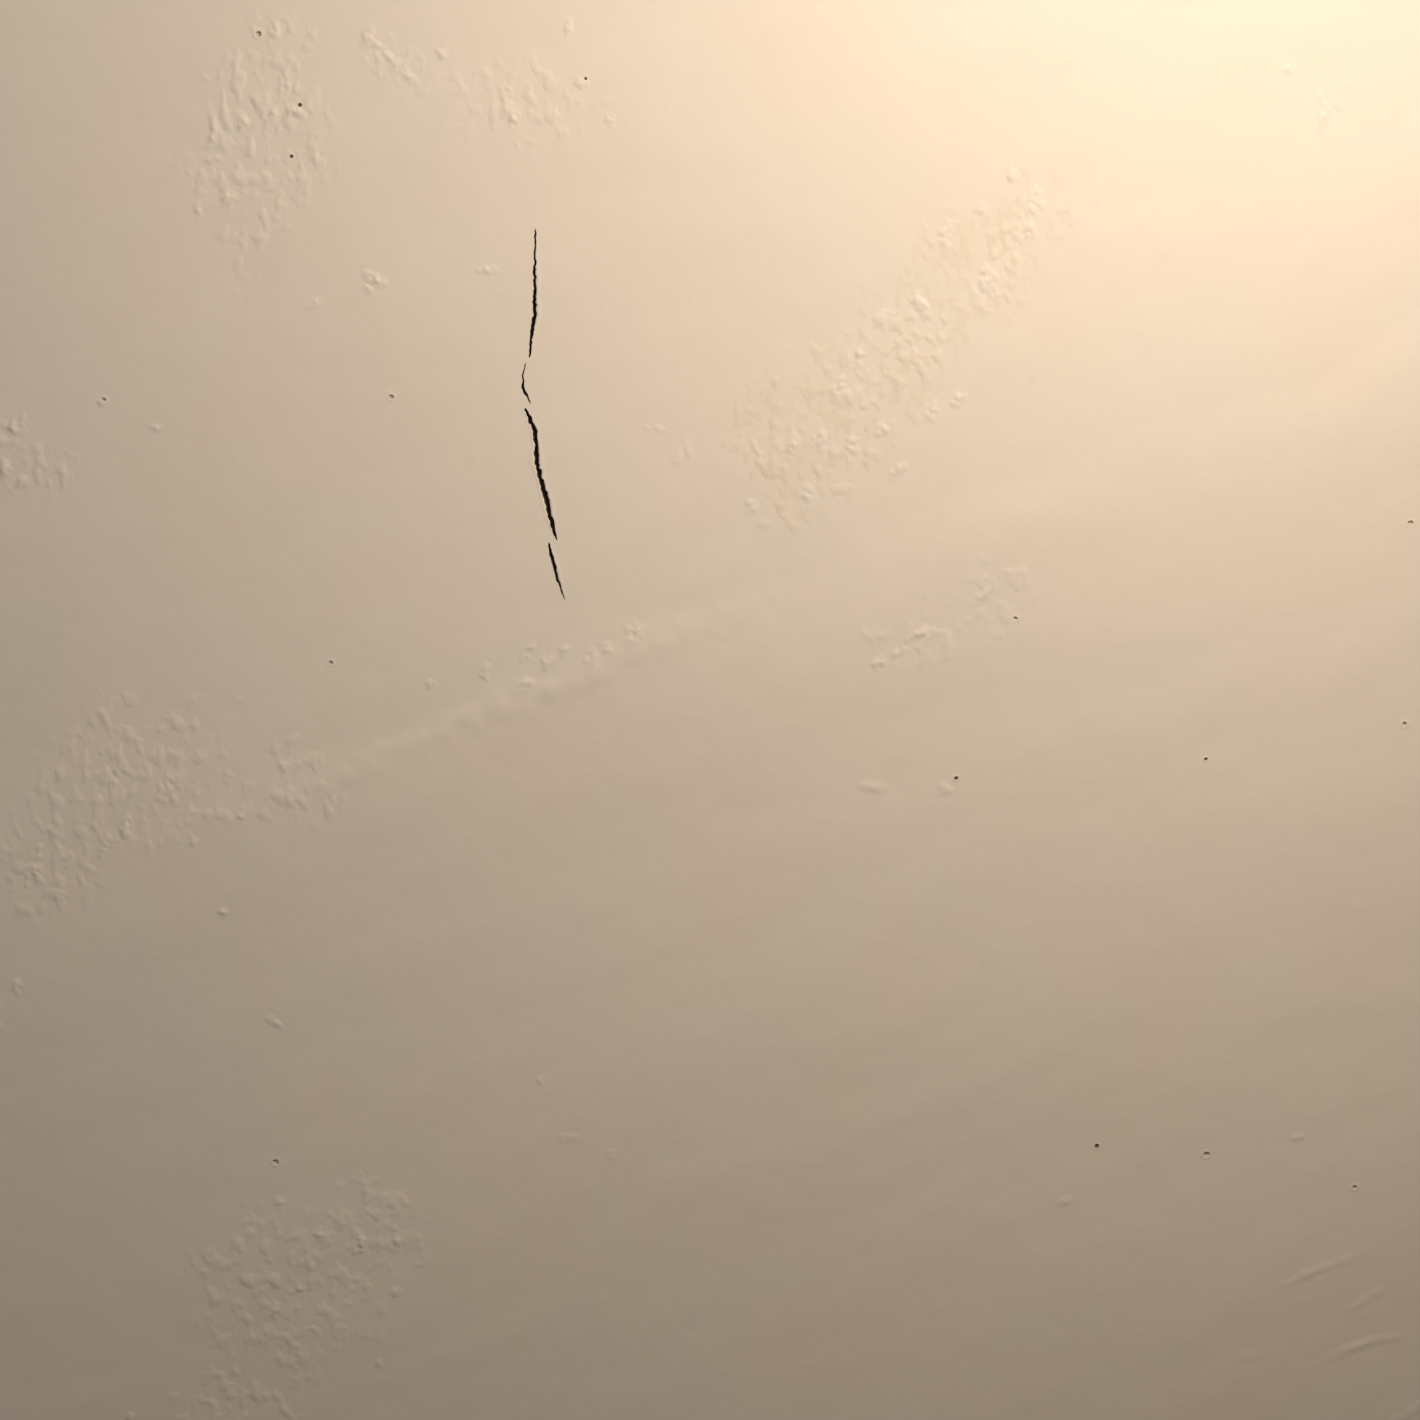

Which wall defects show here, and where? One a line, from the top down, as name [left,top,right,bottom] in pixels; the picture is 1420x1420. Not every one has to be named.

crack [521,229,566,600]